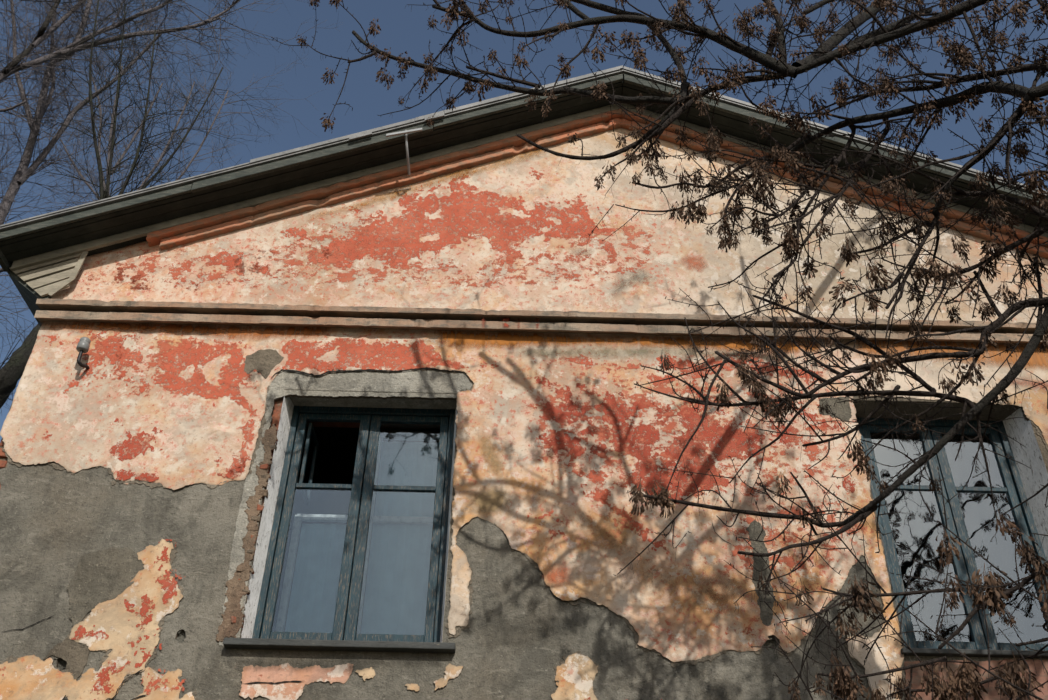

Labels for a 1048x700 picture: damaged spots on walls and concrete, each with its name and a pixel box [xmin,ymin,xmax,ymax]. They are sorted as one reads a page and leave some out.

peeling [87,174,656,291]
spalling [0,330,1048,700]